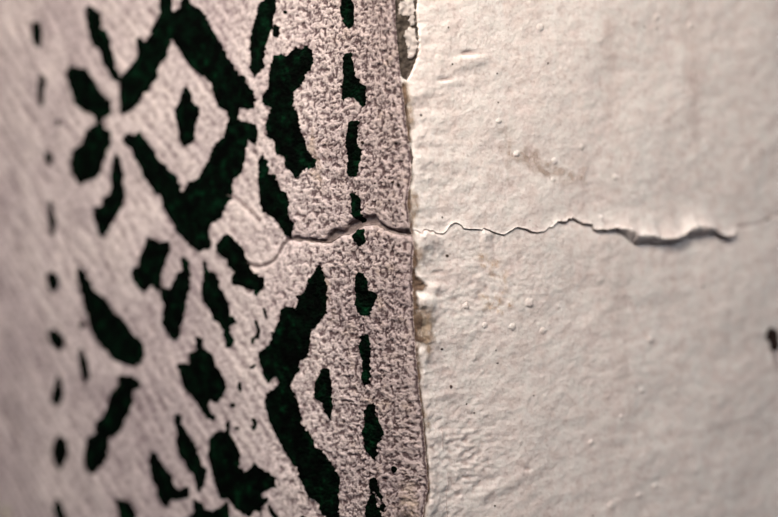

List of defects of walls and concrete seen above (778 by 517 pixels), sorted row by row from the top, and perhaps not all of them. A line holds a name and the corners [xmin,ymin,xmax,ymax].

spalling [395,0,419,80]
crack [247,199,777,267]
spalling [412,271,427,291]
spalling [413,312,424,342]
hole [765,327,778,359]